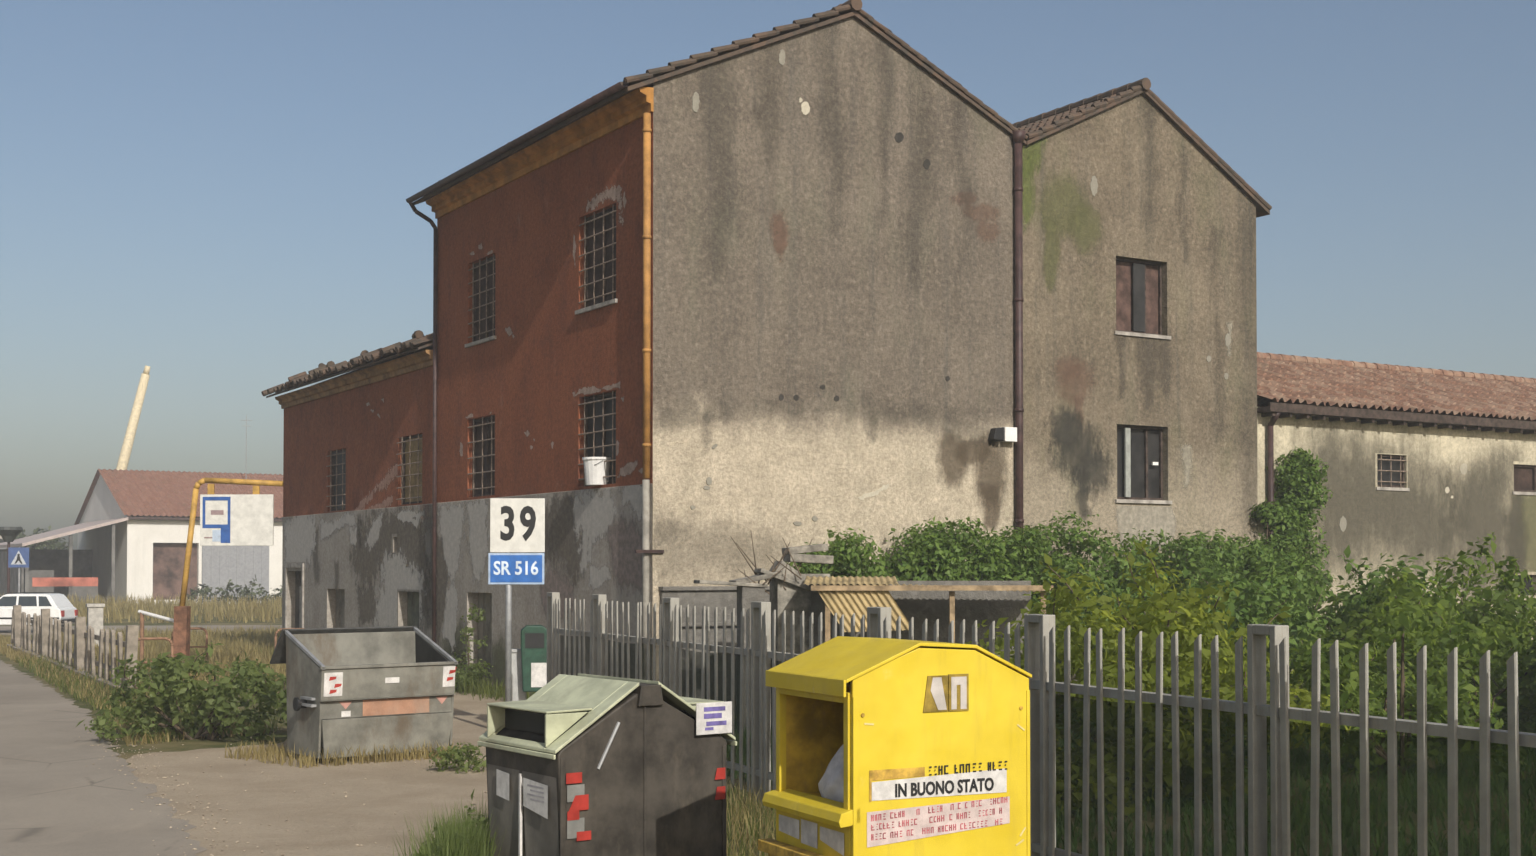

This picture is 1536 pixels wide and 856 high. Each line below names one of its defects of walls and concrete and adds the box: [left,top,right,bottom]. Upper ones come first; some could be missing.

peeling [584,183,627,225]
water stain [1022,158,1059,289]
flaking render [284,464,490,681]
flaking render [539,440,643,620]
water stain [941,434,1004,527]
water stain [1052,408,1112,517]
water stain [1315,429,1536,588]